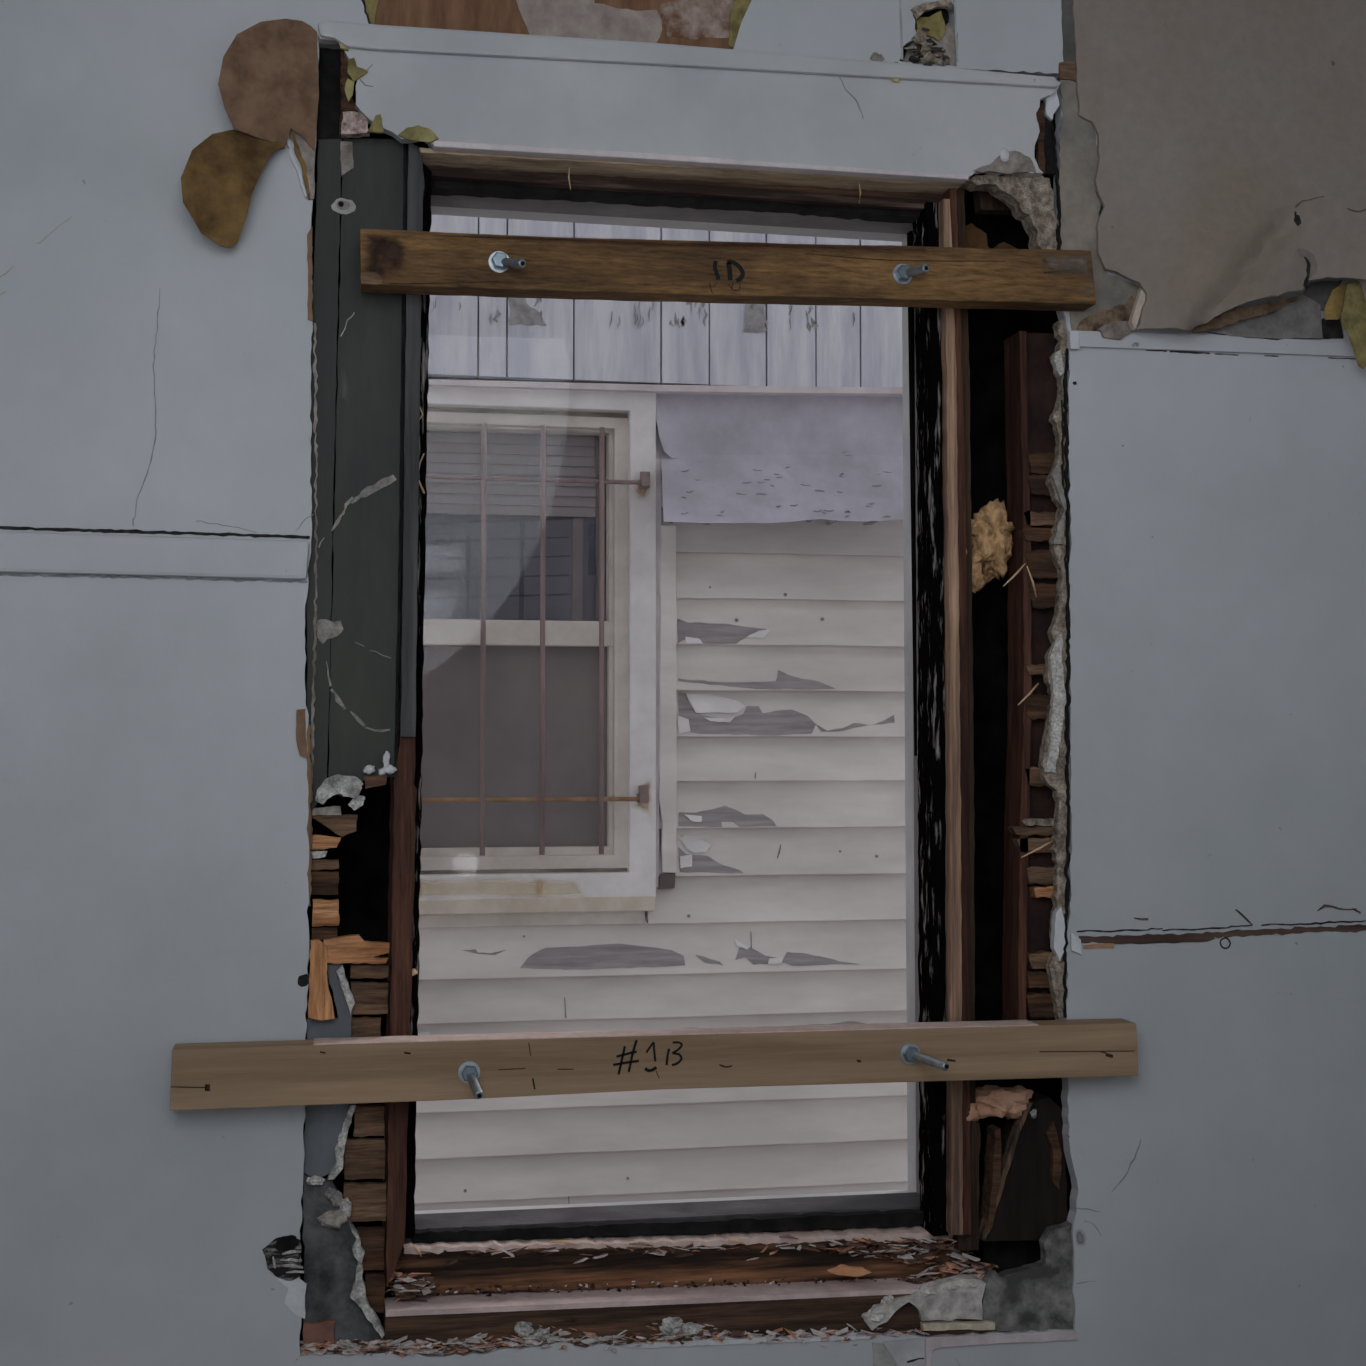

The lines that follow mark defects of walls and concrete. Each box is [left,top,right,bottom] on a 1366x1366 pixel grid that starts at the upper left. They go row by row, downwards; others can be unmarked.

peeling [181,19,319,321]
spalling [339,43,439,157]
peeling [361,0,752,49]
spalling [330,175,343,621]
spalling [908,307,917,756]
flaking render [964,0,1146,1021]
peeling [296,606,308,758]
spalling [305,639,397,1040]
flaking render [262,1102,397,1346]
flaking render [861,1162,1074,1366]
spalling [978,1116,1007,1205]
spalling [976,1078,1062,1109]